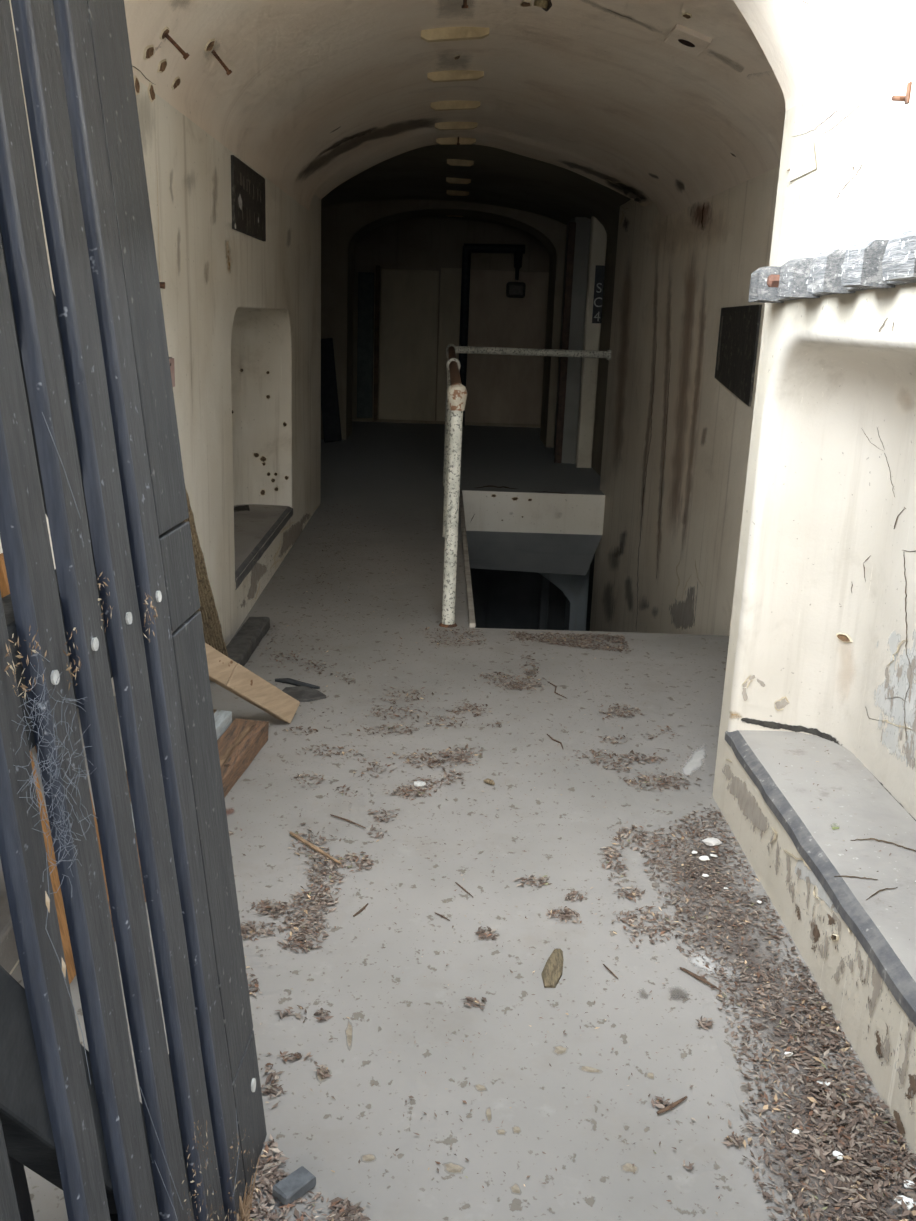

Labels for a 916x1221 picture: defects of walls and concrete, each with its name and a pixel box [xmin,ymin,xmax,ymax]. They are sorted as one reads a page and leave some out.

water stain [669,586,698,629]
crack [862,429,915,753]
peeling [874,629,916,769]